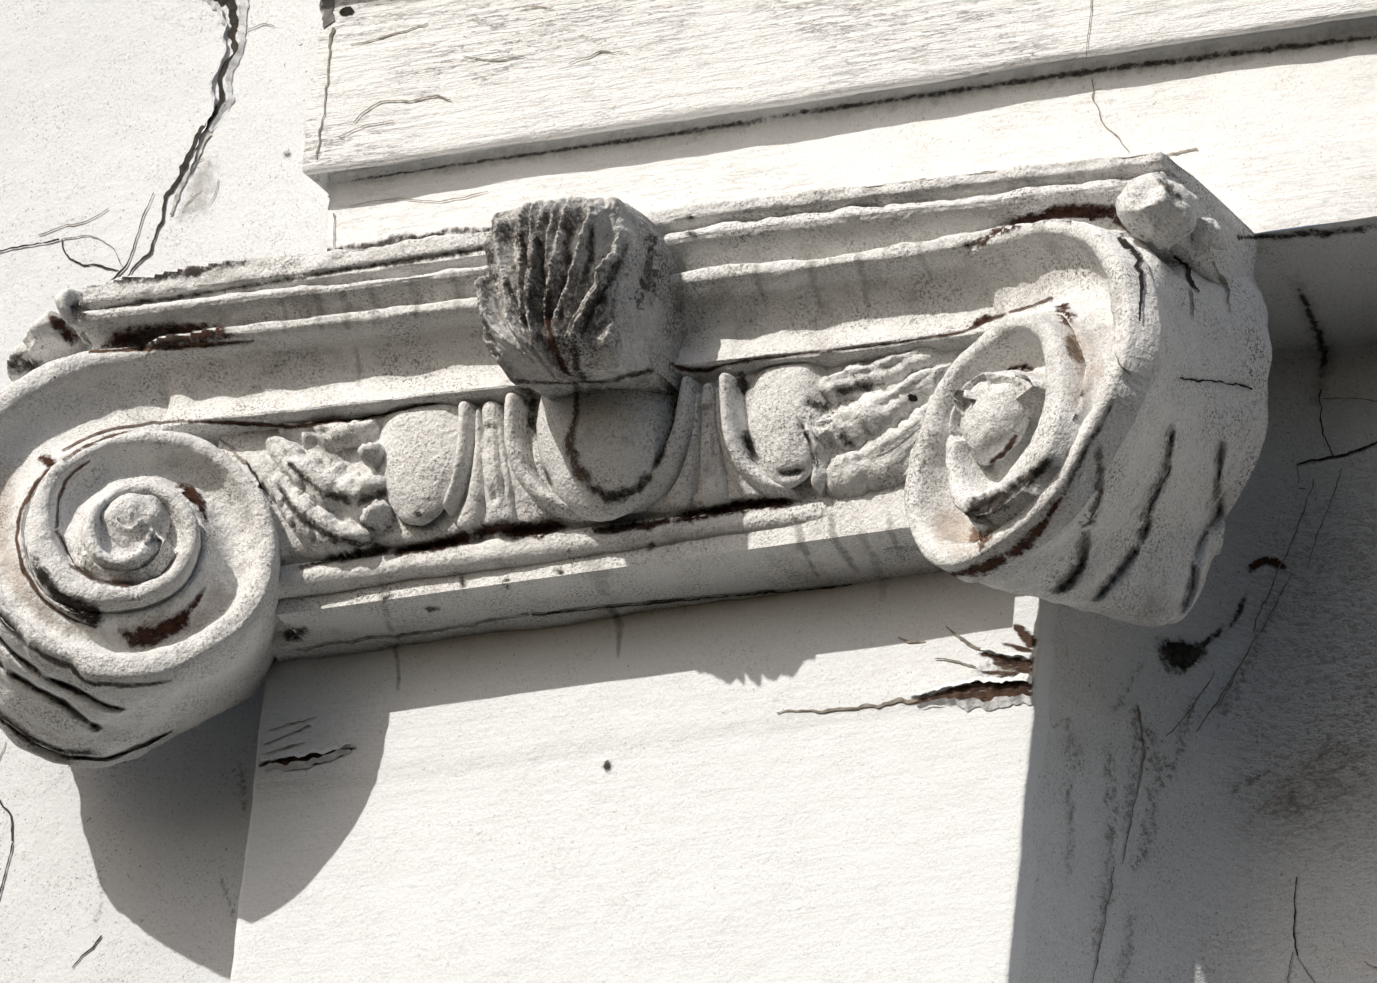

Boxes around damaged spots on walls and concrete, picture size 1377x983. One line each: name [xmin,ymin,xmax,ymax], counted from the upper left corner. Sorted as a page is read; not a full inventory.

crack [1086,0,1130,152]
crack [0,0,249,280]
crack [1166,148,1198,156]
rust [48,311,254,353]
rust [120,587,206,648]
peeling [777,624,1037,713]
peeling [259,717,356,771]
crack [0,800,13,893]
crack [1287,876,1315,983]